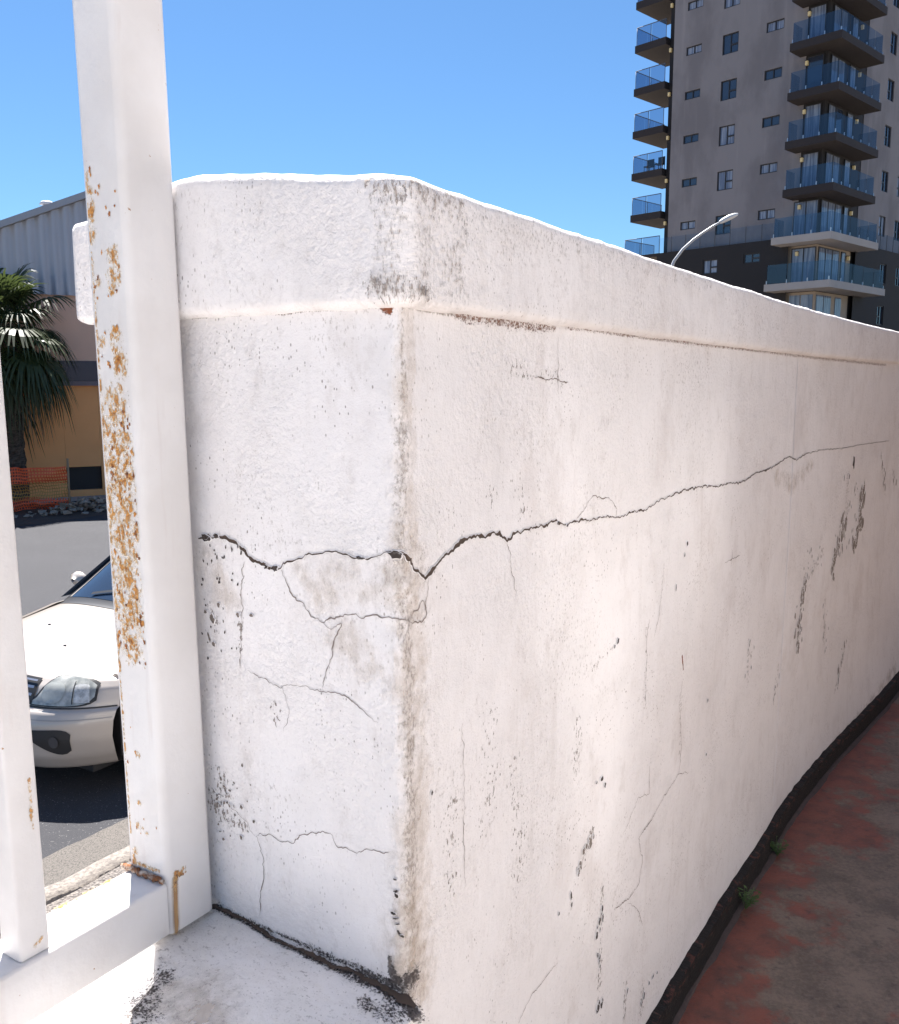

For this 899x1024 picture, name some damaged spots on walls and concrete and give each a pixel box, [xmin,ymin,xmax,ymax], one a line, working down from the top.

leakage [357,176,463,218]
leakage [363,257,434,310]
corrosion [86,166,146,714]
crack [198,440,887,729]
corrosion [173,867,186,933]